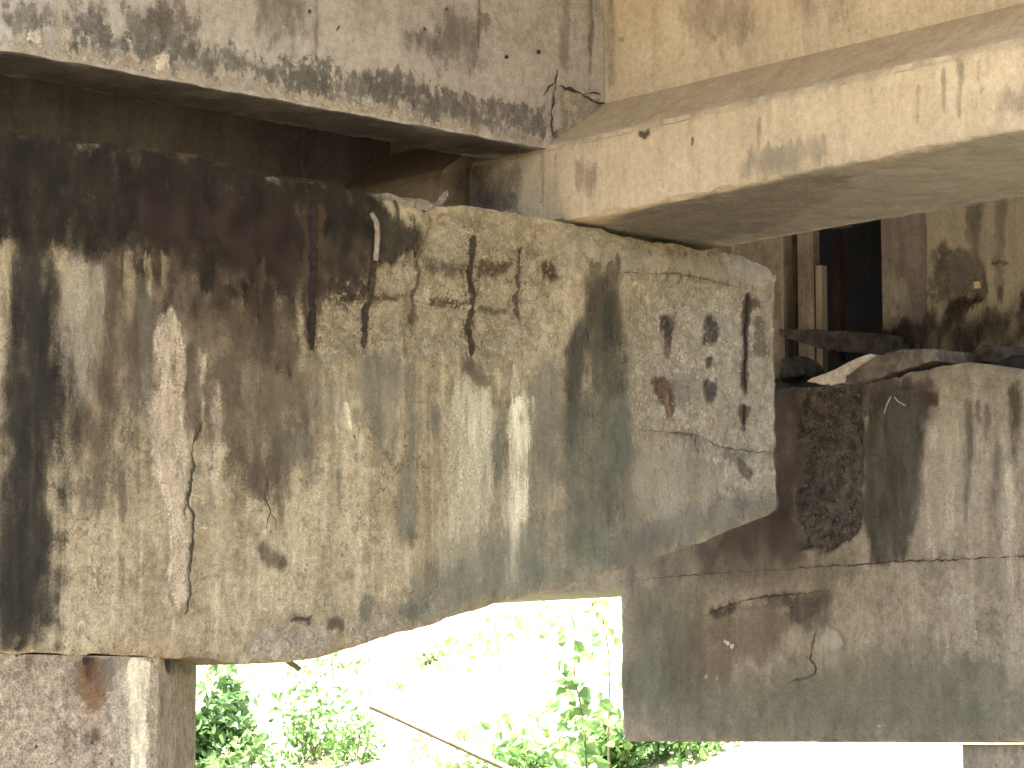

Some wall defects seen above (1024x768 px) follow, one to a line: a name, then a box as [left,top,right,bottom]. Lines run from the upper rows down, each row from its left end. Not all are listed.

leakage [0,0,557,213]
crack [543,70,605,140]
rust [650,376,675,418]
leakage [0,130,1024,740]
crack [642,430,779,455]
spalling [795,385,864,552]
crack [184,417,205,615]
crack [619,555,1024,582]
crack [789,627,818,683]